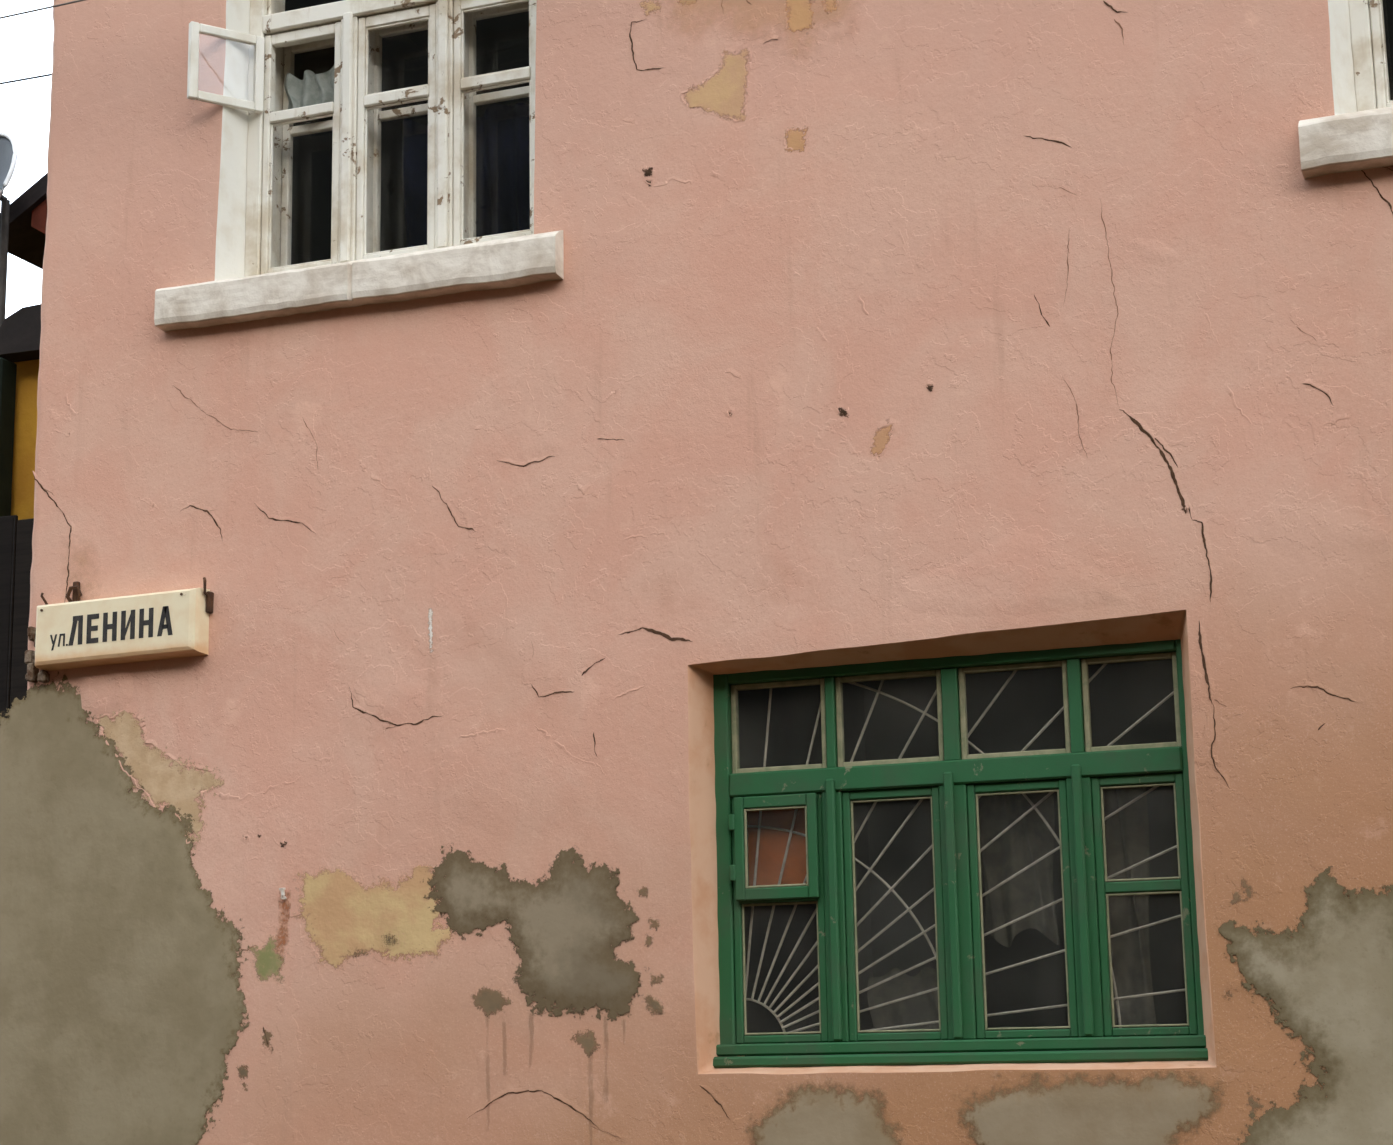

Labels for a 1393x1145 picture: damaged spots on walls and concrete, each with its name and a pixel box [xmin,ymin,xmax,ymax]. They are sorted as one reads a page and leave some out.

peeling [680,45,752,123]
crack [1023,133,1072,147]
crack [1034,234,1069,326]
crack [33,471,76,603]
crack [1059,187,1230,789]
peeling [92,710,227,850]
peeling [298,865,452,968]